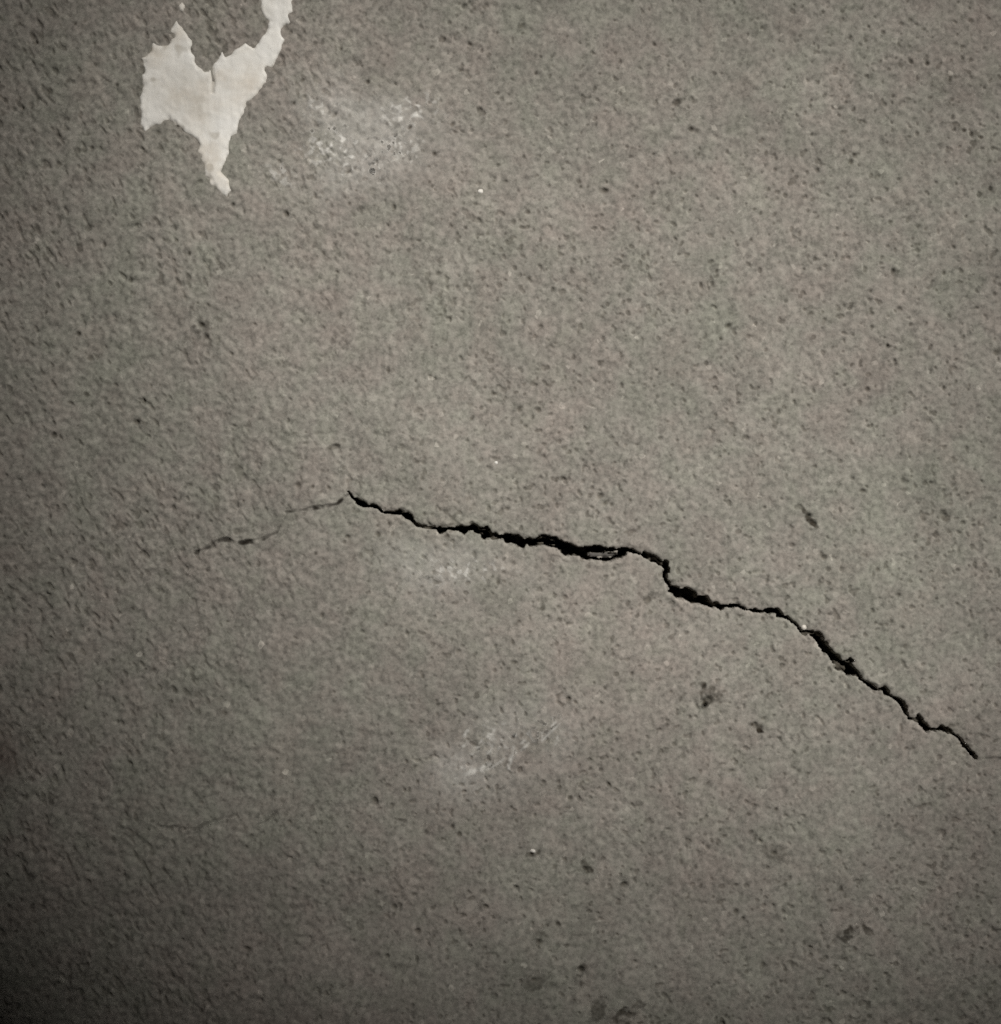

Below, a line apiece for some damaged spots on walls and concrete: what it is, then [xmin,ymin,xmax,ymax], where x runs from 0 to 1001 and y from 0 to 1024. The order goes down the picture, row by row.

peeling [139,0,293,197]
crack [219,537,264,545]
crack [314,492,975,759]